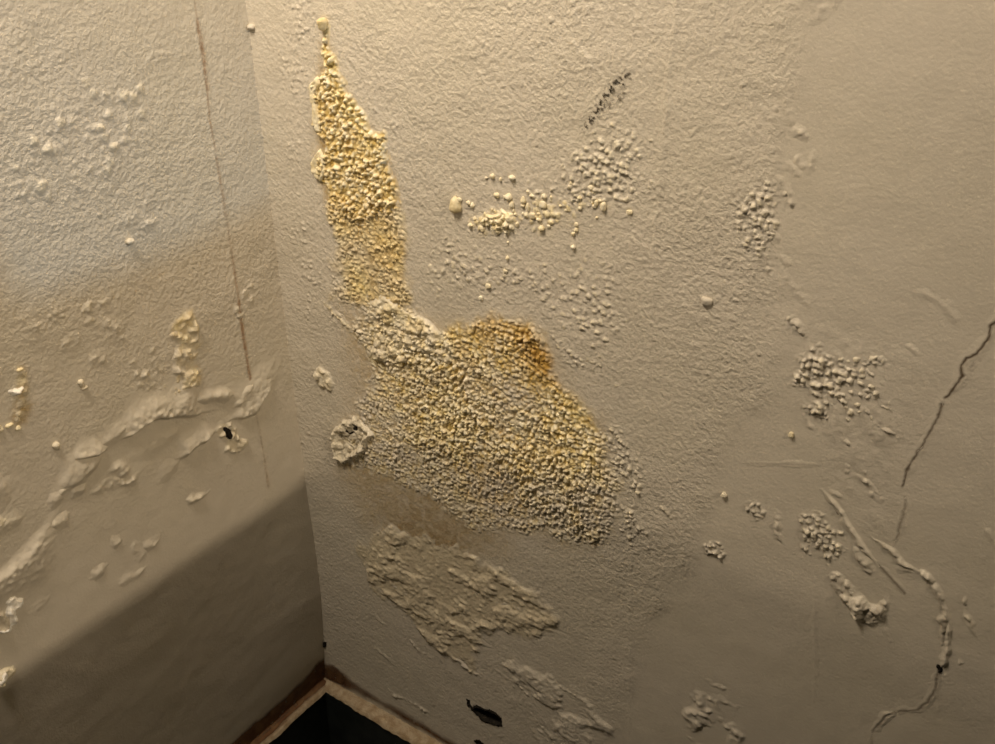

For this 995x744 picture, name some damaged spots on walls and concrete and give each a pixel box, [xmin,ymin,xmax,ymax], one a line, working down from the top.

leakage [308,17,633,558]
spalling [819,488,907,645]
crack [867,309,995,744]